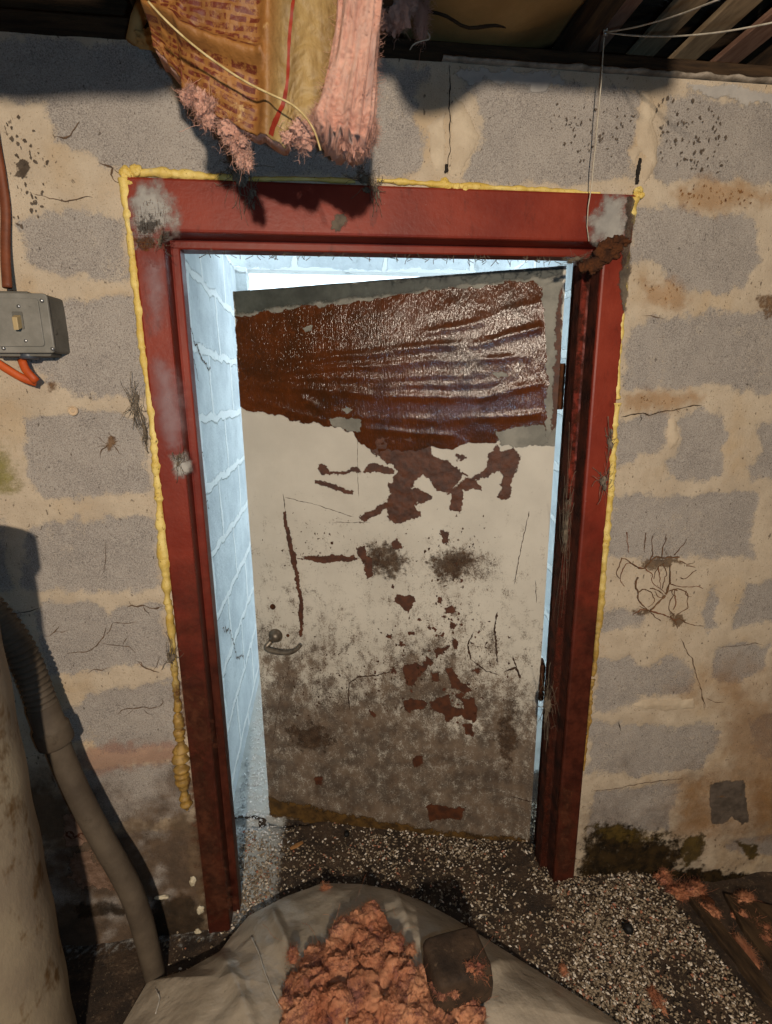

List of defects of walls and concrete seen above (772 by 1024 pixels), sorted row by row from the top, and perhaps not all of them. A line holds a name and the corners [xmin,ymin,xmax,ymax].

crack [445,66,453,174]
peeling [315,437,521,524]
peeling [303,546,374,579]
rust [234,196,635,878]
peeling [374,584,484,737]
water stain [268,796,530,842]
peeling [426,803,466,822]
water stain [575,823,748,882]
water stain [738,842,759,860]